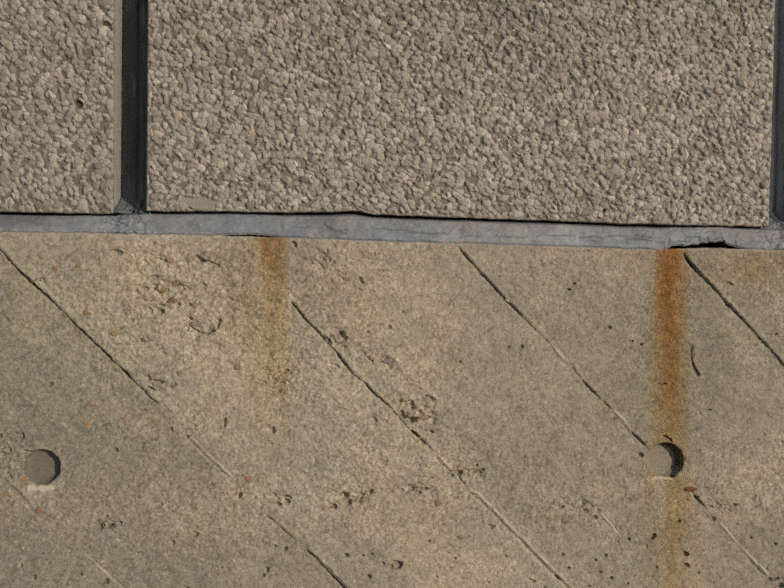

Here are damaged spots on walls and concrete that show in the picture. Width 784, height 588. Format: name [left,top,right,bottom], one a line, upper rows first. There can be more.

crack [522,316,551,347]
crack [603,399,613,410]
crack [419,436,438,456]